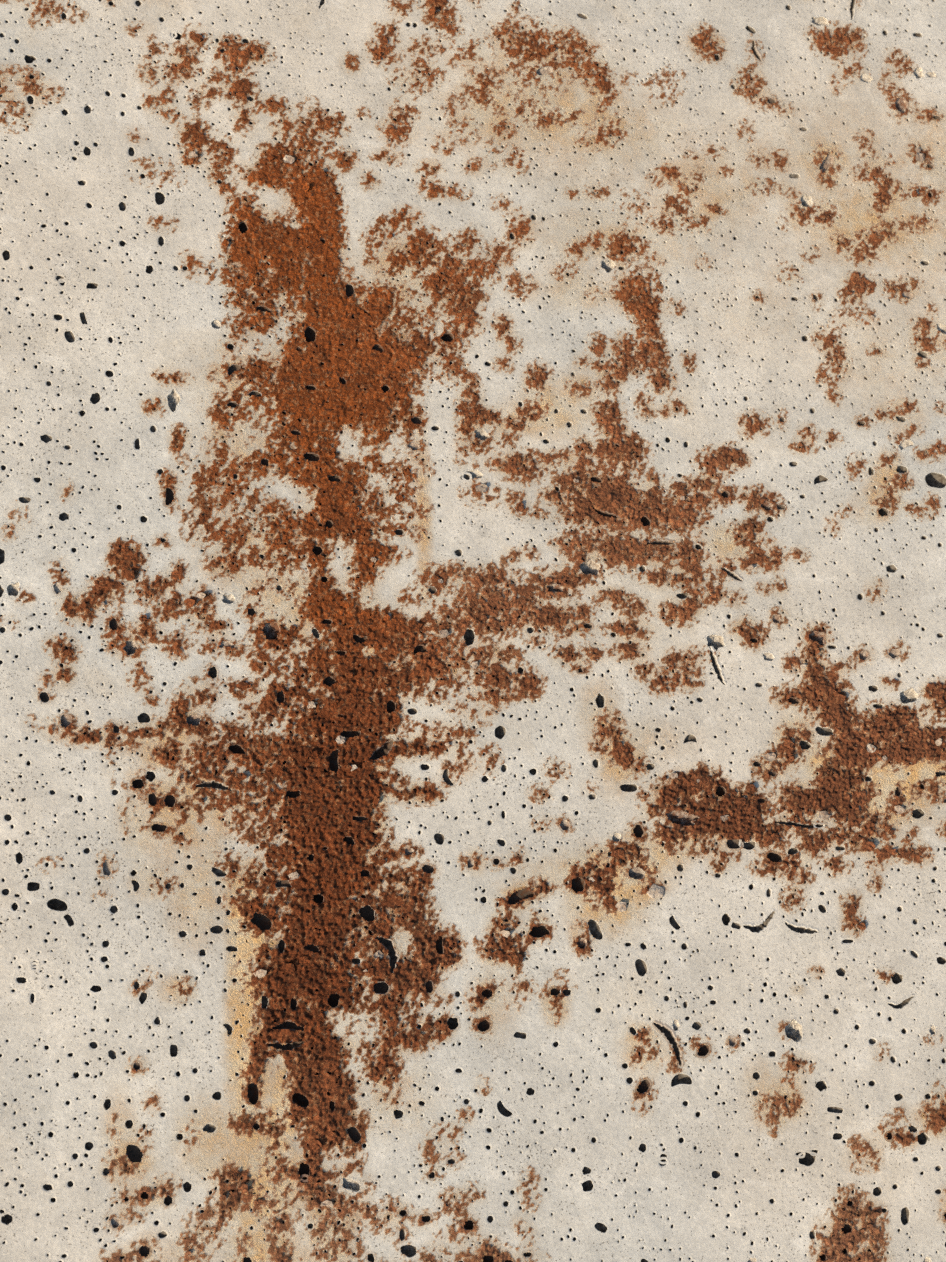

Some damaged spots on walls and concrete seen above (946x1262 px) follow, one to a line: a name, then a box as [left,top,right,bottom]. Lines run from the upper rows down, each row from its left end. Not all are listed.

rust [357,0,688,202]
rust [729,20,946,407]
rust [141,370,195,418]
rust [491,311,523,374]
rust [846,397,946,522]
rust [728,606,789,653]
rust [457,621,946,1040]
rust [626,1024,742,1117]
rust [753,1021,816,1139]
rust [101,1113,182,1237]
rust [418,1106,475,1180]
rust [809,1080,946,1262]